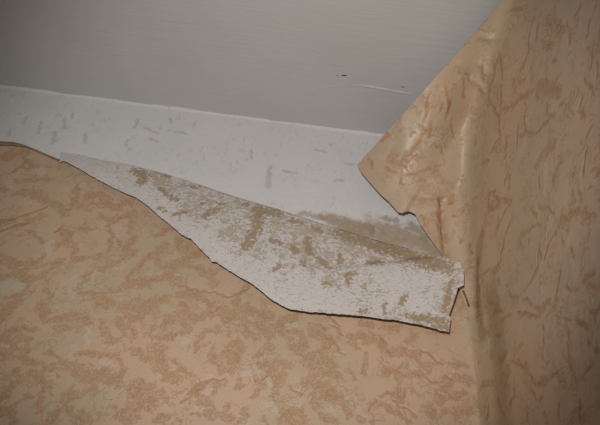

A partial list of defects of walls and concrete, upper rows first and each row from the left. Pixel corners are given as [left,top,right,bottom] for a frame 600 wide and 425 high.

peeling [129,168,150,186]
peeling [240,202,457,331]